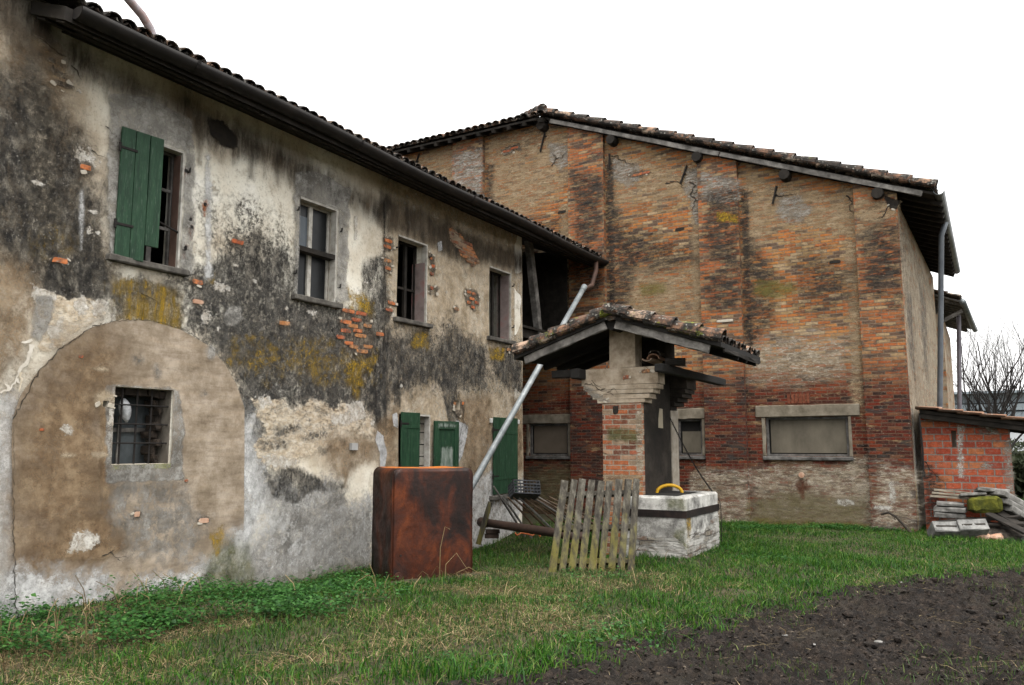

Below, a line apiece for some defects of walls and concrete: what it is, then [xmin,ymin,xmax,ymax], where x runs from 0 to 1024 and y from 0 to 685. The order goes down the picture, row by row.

flaking render [381,237,396,274]
flaking render [428,251,448,296]
flaking render [449,227,480,267]
leakage [569,162,775,346]
peeling [0,287,109,393]
leakage [0,0,545,618]
flaking render [336,307,384,358]
flaking render [453,287,480,312]
peeling [251,396,377,471]
leakage [689,458,944,531]
peeling [67,530,100,554]